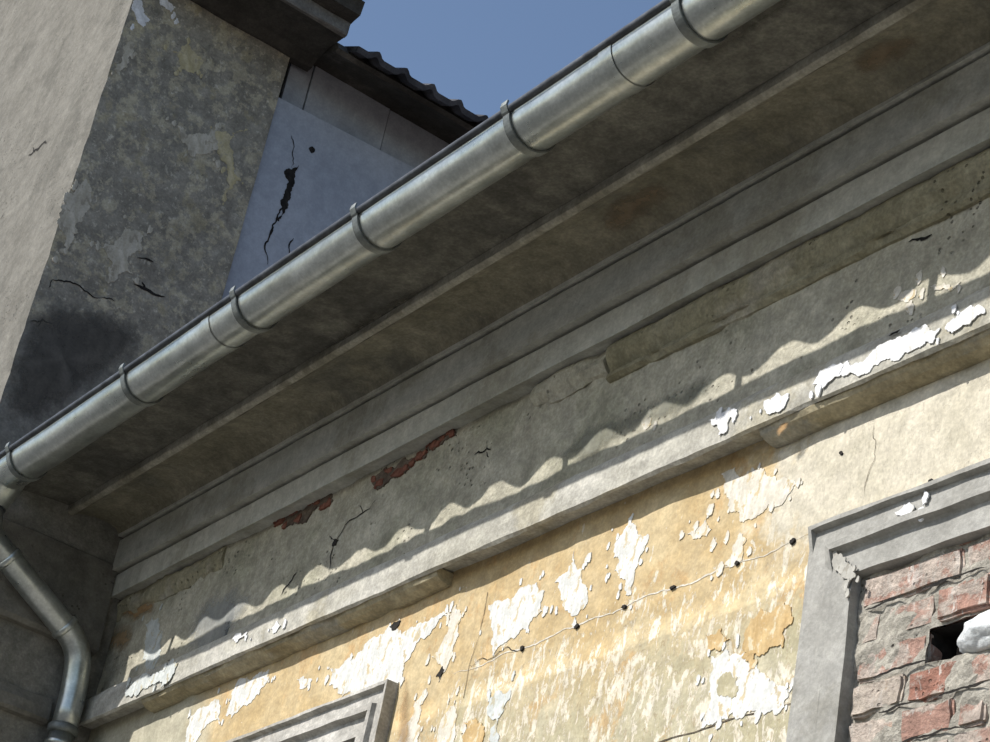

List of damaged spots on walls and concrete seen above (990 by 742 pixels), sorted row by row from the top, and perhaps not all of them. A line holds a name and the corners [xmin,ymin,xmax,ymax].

water stain [14,312,133,413]
crack [49,279,114,301]
crack [134,257,165,297]
crack [264,207,294,264]
peeling [809,266,986,400]
crack [330,503,373,565]
peeling [679,463,803,581]
peeling [185,670,276,742]
peeling [297,601,468,742]
peeling [479,552,592,656]
peeling [695,633,794,742]
spalling [930,619,971,662]